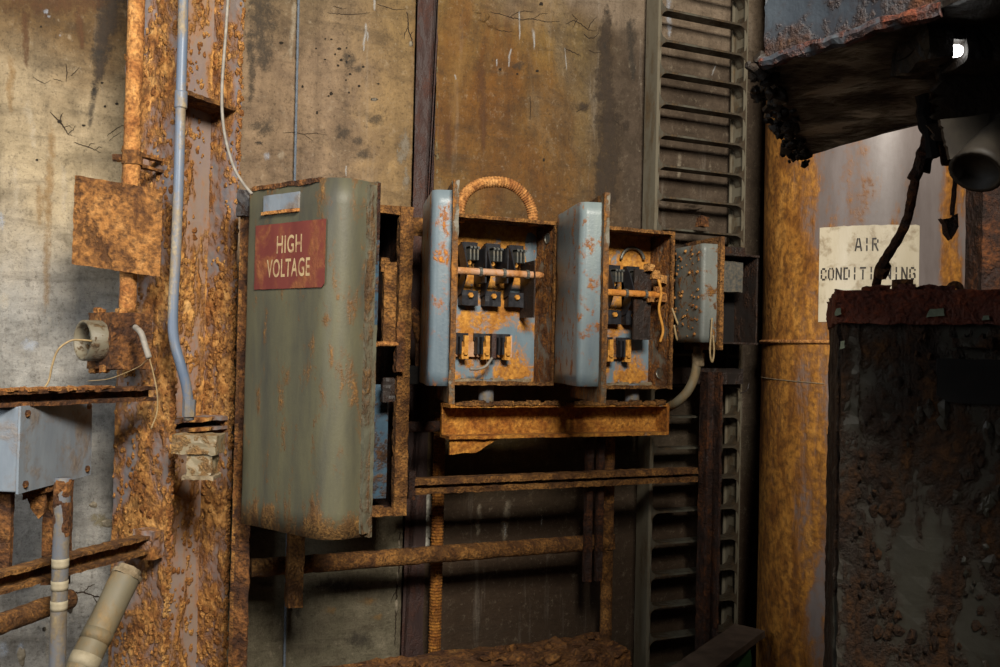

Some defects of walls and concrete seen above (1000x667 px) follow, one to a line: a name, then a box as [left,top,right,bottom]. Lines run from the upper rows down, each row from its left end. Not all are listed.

water stain [5,0,127,125]
crack [50,112,124,153]
crack [491,11,601,55]
water stain [595,11,629,209]
corrosion [108,0,246,667]